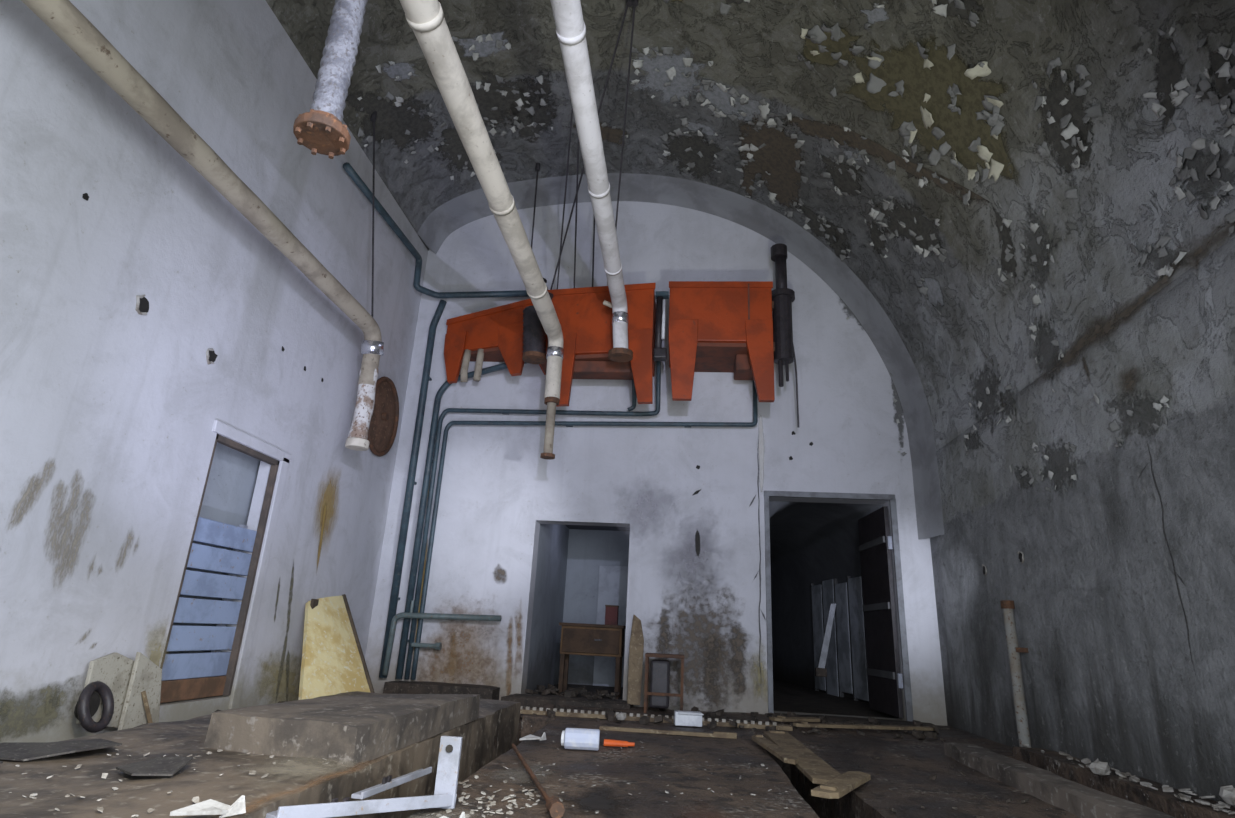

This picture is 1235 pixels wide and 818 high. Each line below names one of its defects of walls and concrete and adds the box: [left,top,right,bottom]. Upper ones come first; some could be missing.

peeling [345,61,476,180]
peeling [452,32,576,176]
peeling [599,121,628,146]
peeling [1143,27,1235,236]
peeling [629,0,1064,393]
peeling [964,352,1016,456]
peeling [1009,439,1077,493]
peeling [1092,393,1170,449]
water stain [55,475,90,579]
water stain [679,540,707,575]
water stain [651,589,765,711]
water stain [0,680,74,738]